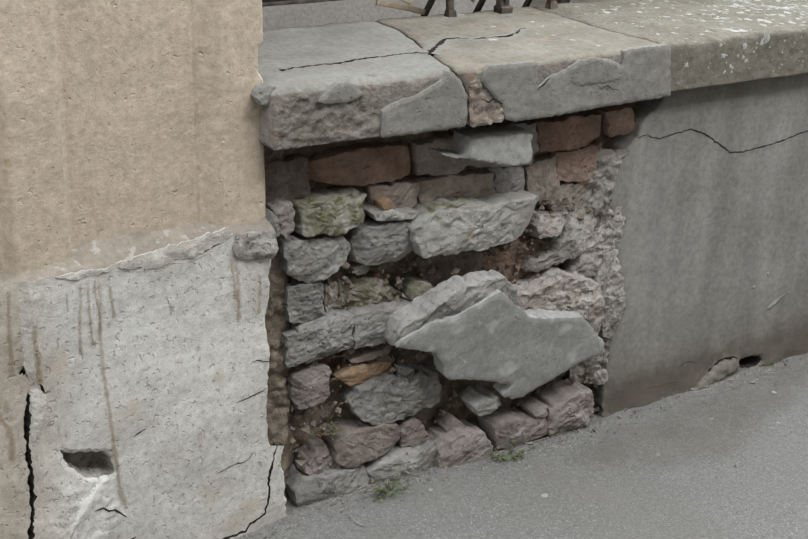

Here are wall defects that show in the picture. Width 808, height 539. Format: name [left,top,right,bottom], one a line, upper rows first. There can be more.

crack [279,28,527,71]
crack [638,129,808,155]
flaking render [579,149,629,224]
flaking render [383,269,612,399]
spalling [693,351,765,391]
crack [17,370,51,539]
spalling [58,448,119,483]
crack [187,443,284,539]